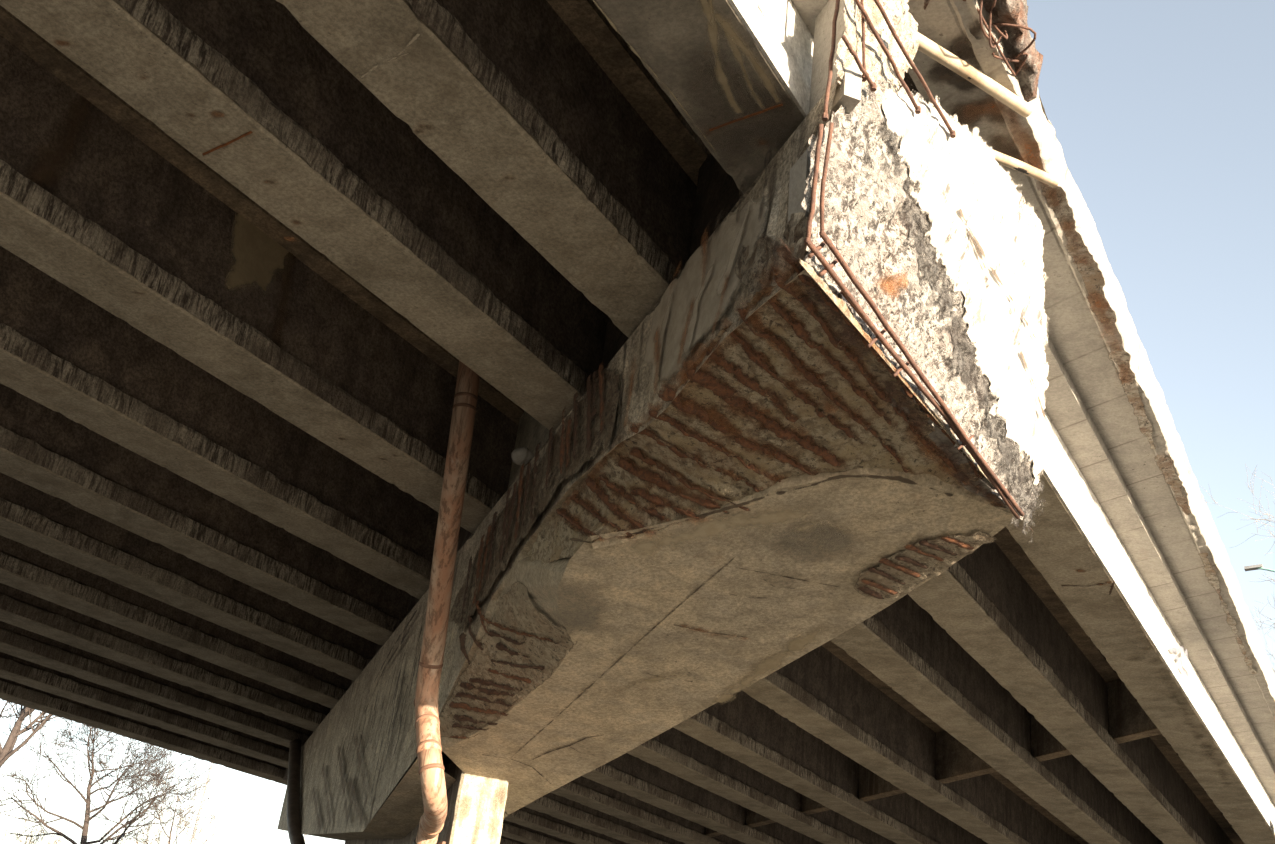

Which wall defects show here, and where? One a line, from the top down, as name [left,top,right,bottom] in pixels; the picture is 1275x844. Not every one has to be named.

leakage [691,0,798,219]
leakage [227,213,295,347]
spalling [527,0,1117,564]
spalling [1109,350,1191,515]
spalling [439,581,577,739]
crack [487,559,837,784]
spalling [854,531,997,599]
spalling [1199,553,1257,674]